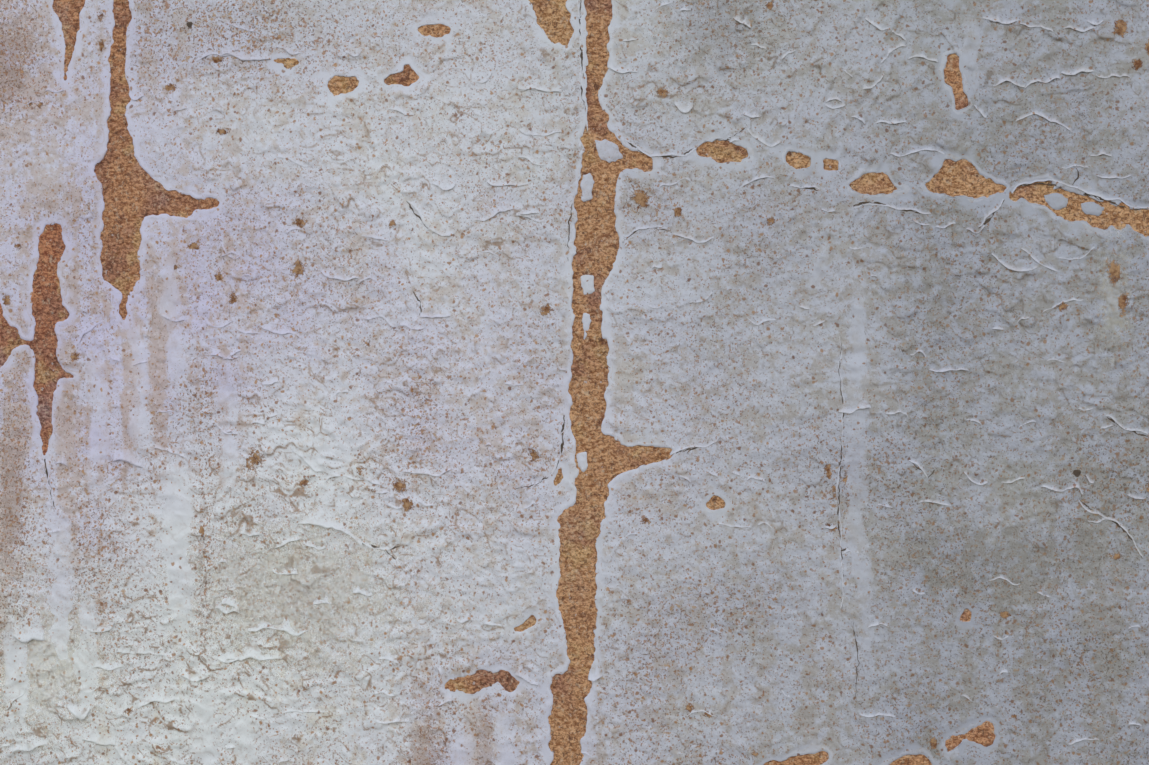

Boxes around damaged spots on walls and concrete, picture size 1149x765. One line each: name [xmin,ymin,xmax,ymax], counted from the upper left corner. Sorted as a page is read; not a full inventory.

peeling [414,18,451,39]
peeling [326,64,425,115]
peeling [844,14,987,118]
peeling [693,106,1149,272]
peeling [0,0,222,467]
peeling [518,0,693,765]
peeling [456,612,538,634]
peeling [437,664,521,706]
peeling [763,743,834,765]
peeling [879,718,996,765]